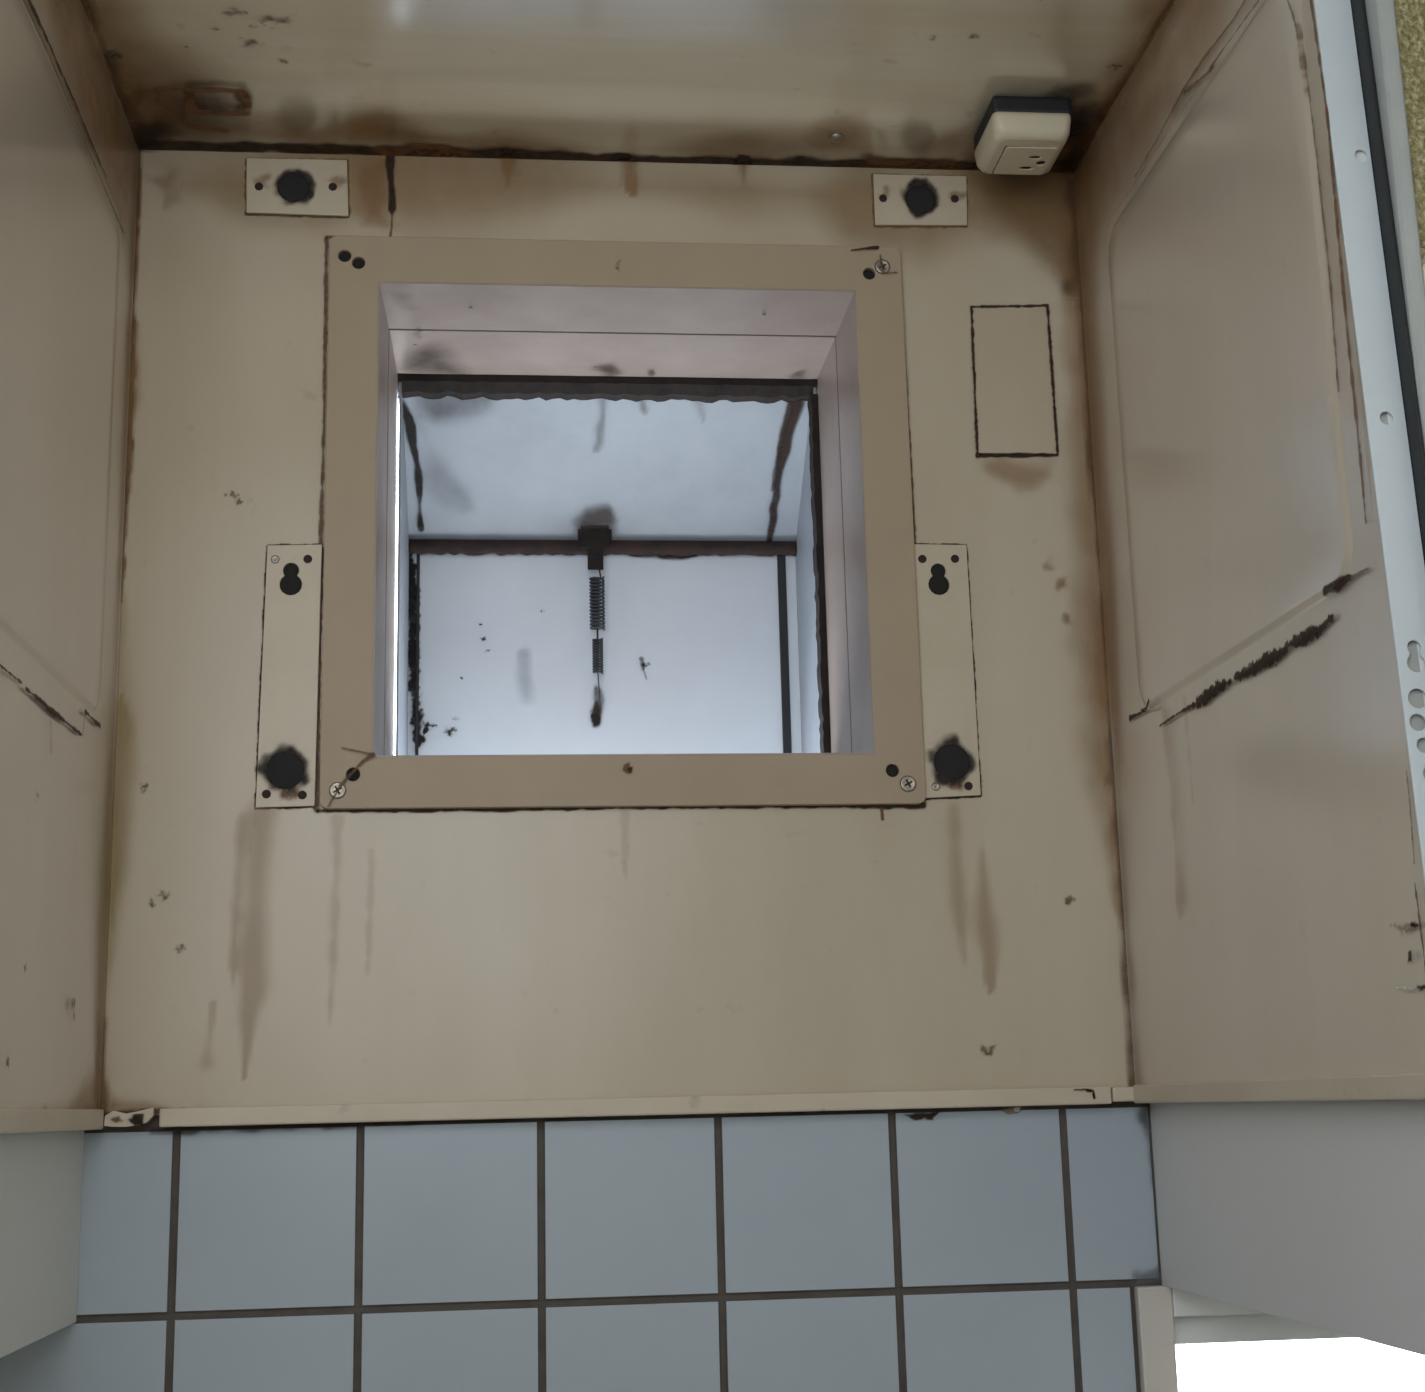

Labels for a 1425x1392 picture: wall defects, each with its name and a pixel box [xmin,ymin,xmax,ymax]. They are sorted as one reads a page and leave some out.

corrosion [120,87,981,602]
corrosion [100,1020,164,1118]